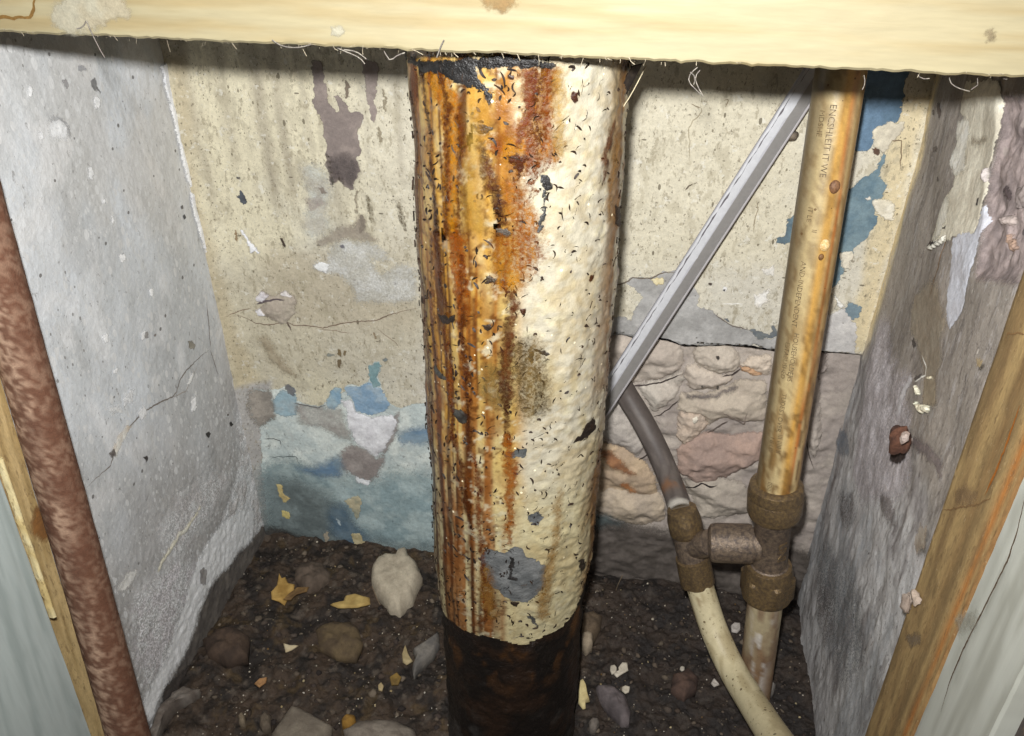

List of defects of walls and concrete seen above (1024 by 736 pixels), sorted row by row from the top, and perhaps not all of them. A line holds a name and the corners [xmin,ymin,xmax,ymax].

crack [90,303,411,484]
peeling [221,358,434,552]
rust [409,64,565,627]
rust [601,121,620,215]
spalling [574,402,670,536]
spalling [630,283,777,529]
peeling [776,215,794,245]
spalling [789,70,909,554]
peeling [927,78,1024,330]
peeling [480,547,546,607]